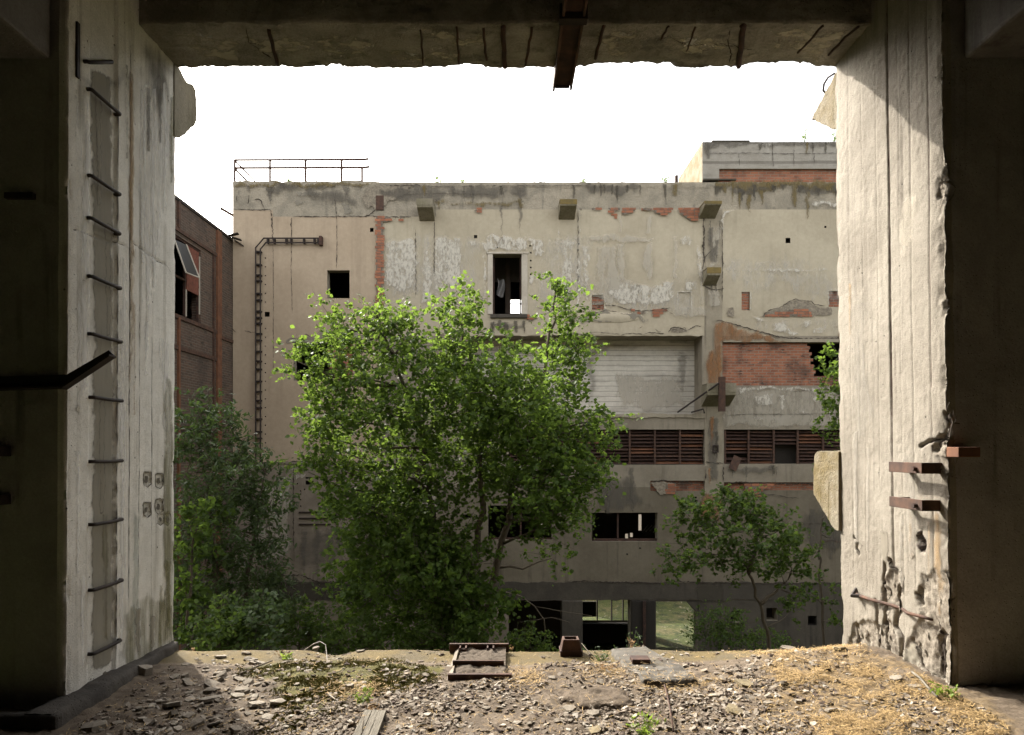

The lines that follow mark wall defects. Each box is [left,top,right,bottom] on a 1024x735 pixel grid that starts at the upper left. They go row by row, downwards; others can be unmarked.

leakage [90,71,117,669]
peeling [362,183,544,305]
spalling [578,207,700,221]
peeling [558,211,734,324]
rust [706,322,774,383]
leakage [715,180,837,215]
spalling [750,289,837,336]
spalling [832,568,951,685]